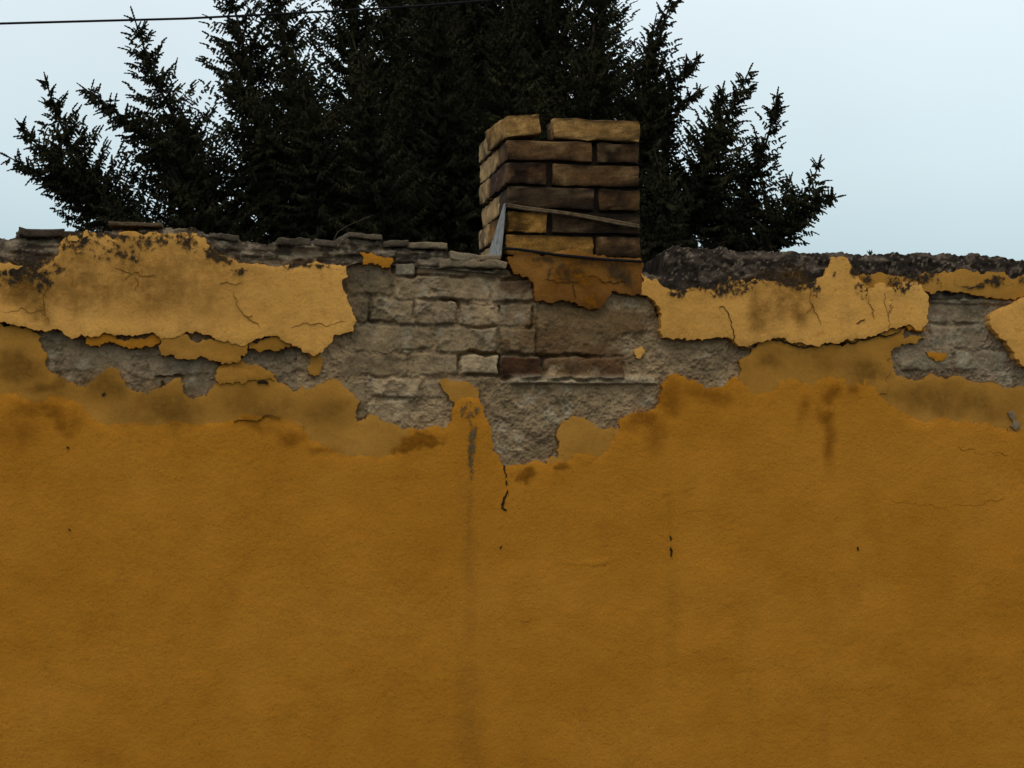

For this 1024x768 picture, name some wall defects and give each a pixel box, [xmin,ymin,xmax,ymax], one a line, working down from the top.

spalling [15,227,97,239]
leakage [58,226,245,275]
leakage [0,248,67,312]
leakage [668,268,821,306]
leakage [842,259,872,295]
leakage [887,271,1005,312]
spalling [0,232,1024,479]
crack [500,466,508,511]